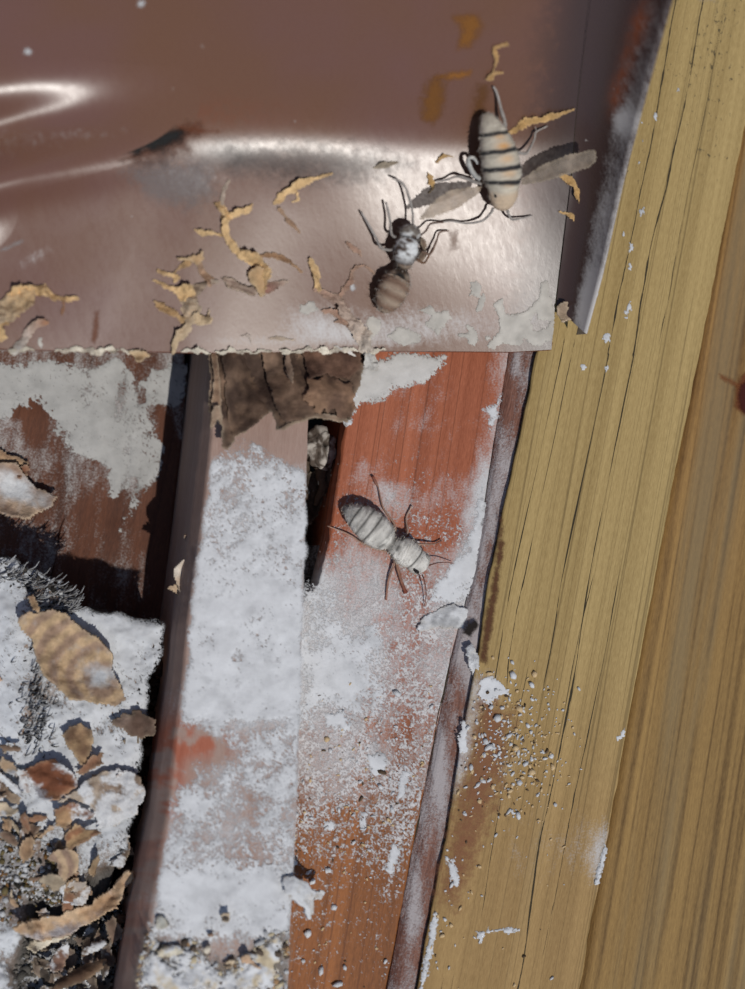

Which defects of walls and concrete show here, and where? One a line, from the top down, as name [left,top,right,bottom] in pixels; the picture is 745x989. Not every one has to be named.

rust [130,128,197,164]
peeling [366,305,452,346]
peeling [458,280,555,350]
peeling [128,349,150,362]
damp [0,826,63,924]